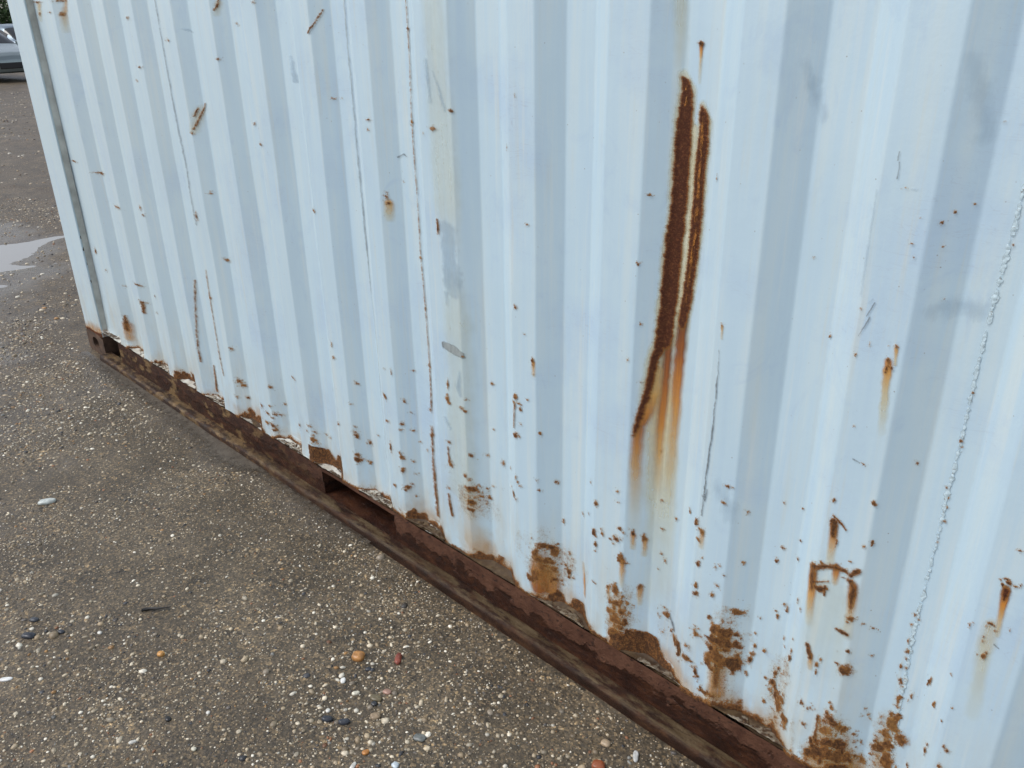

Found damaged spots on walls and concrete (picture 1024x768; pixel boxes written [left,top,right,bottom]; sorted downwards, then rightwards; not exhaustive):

rust [632,71,717,484]
rust [123,315,196,383]
rust [883,344,899,401]
rust [202,380,913,768]
rust [969,578,1022,659]